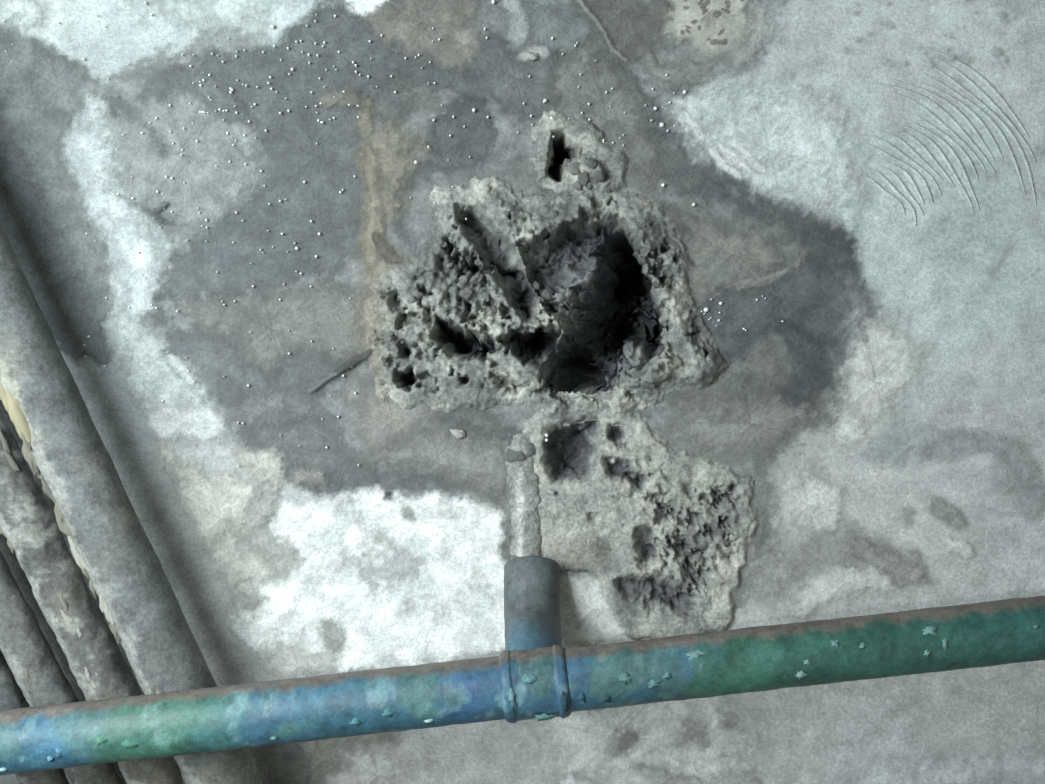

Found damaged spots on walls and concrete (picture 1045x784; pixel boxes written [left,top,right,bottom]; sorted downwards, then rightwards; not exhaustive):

damp [0,0,928,644]
spalling [365,174,760,646]
damp [929,497,973,559]